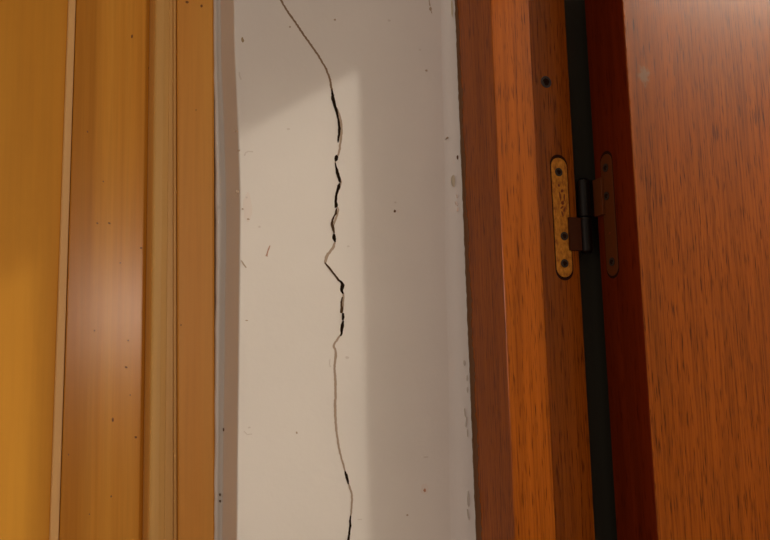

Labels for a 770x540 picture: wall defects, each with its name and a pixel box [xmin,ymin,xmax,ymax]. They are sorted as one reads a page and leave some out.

crack [280,0,353,540]